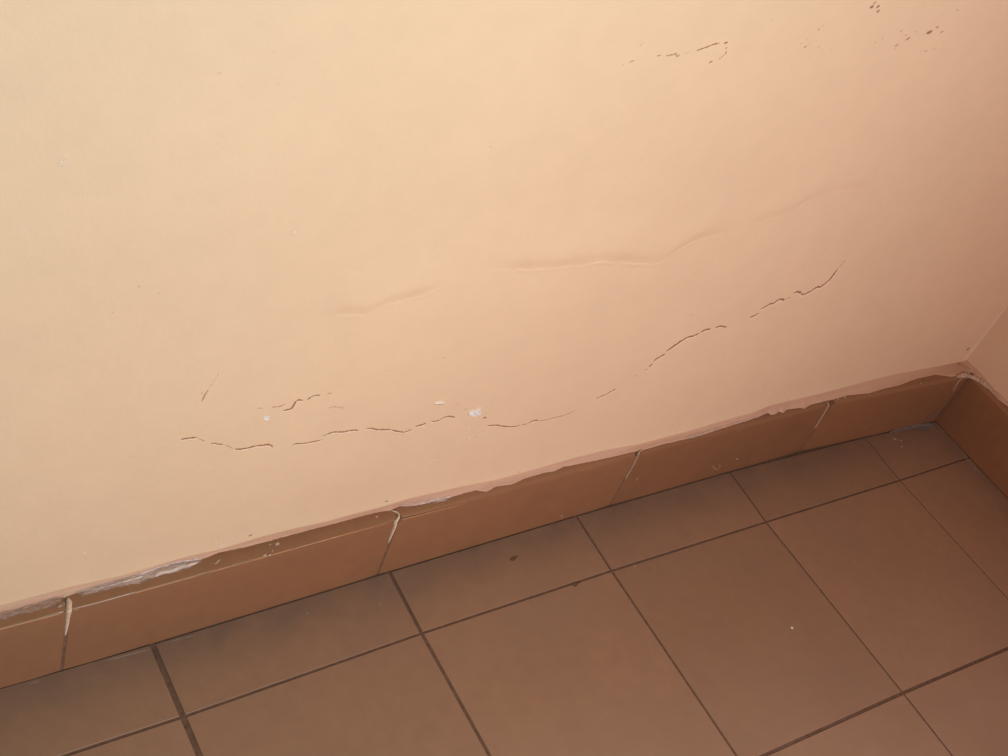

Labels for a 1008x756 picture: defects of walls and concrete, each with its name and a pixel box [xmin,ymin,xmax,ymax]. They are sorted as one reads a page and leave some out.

crack [750,261,845,319]
crack [646,325,726,371]
crack [278,393,330,413]
crack [180,416,455,452]
crack [485,413,569,429]
peeling [0,362,972,613]